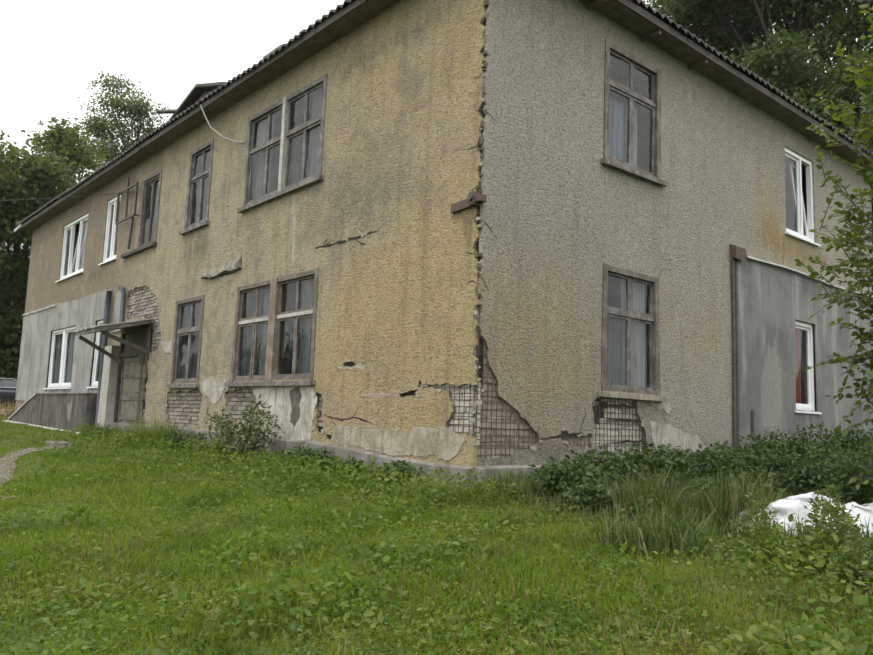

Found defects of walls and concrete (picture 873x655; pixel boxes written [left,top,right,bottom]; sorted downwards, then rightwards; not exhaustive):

crack [315,231,377,249]
crack [466,51,495,385]
spalling [123,286,164,359]
spalling [165,388,203,429]
spalling [227,388,256,420]
crack [323,365,399,424]
spalling [401,292,542,459]